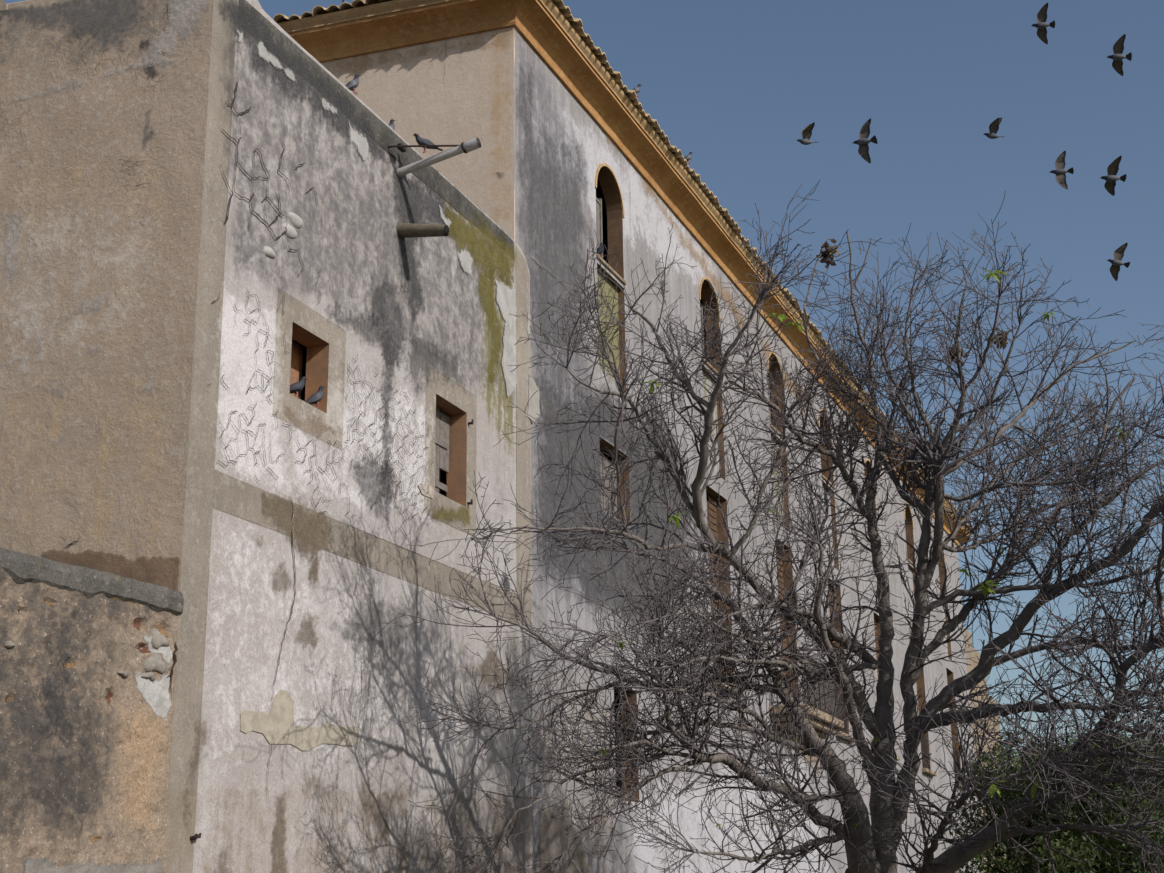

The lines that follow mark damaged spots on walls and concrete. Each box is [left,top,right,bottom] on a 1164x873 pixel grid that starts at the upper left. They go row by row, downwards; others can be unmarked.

leakage [221,4,455,512]
leakage [478,268,512,381]
crack [209,79,434,706]
spalling [42,549,180,591]
leakage [309,557,318,581]
spalling [133,620,172,721]
leakage [272,797,287,873]